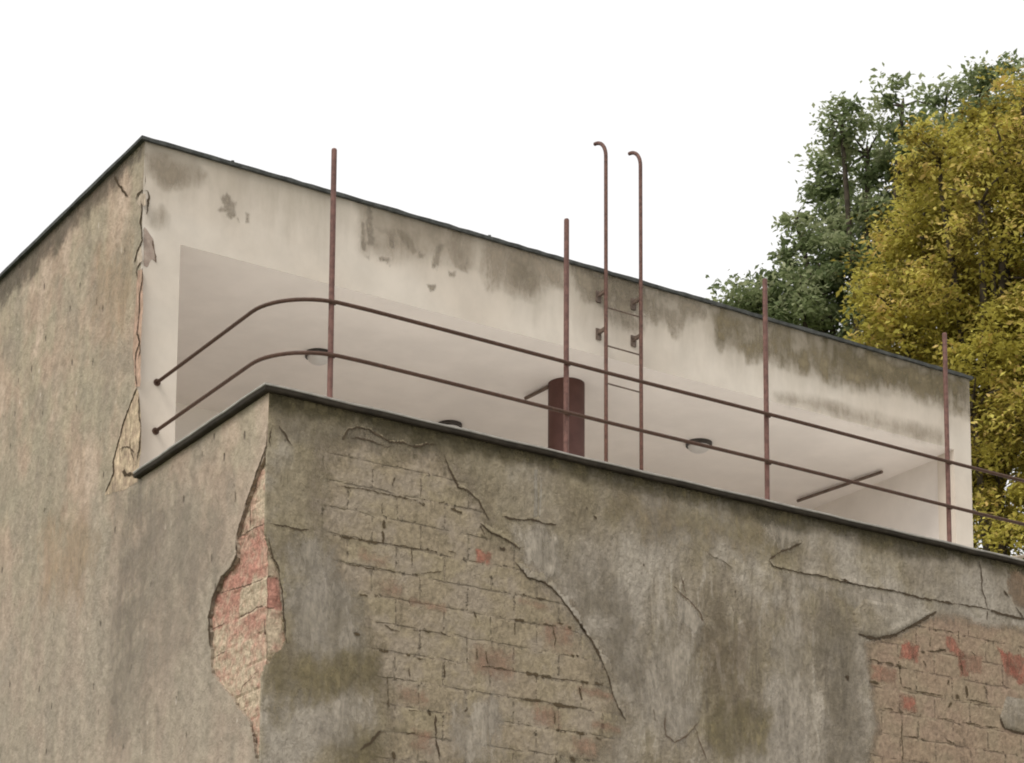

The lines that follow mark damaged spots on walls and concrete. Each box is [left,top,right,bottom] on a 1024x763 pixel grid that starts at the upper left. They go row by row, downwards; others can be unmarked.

water stain [0,148,200,300]
crack [114,176,150,385]
water stain [486,243,561,287]
water stain [572,265,969,412]
flaking render [205,462,291,759]
peeling [312,429,621,763]
crack [769,543,1024,620]
peeling [866,616,1024,763]